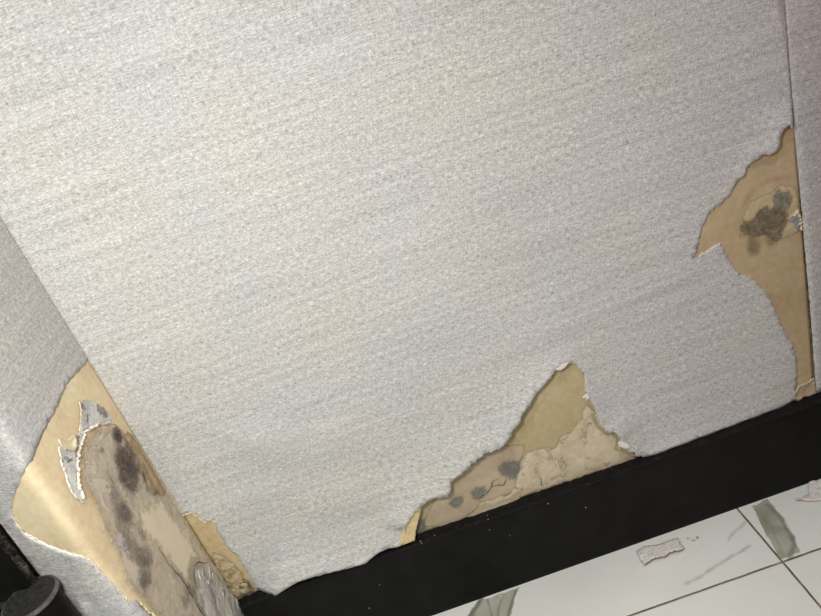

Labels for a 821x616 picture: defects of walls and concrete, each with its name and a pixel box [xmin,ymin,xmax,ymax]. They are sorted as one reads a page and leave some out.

leakage [740,190,792,253]
spalling [740,185,803,240]
leakage [110,426,153,589]
spalling [58,399,250,616]
leakage [449,487,486,507]
leakage [498,461,520,479]
spalling [424,401,635,527]